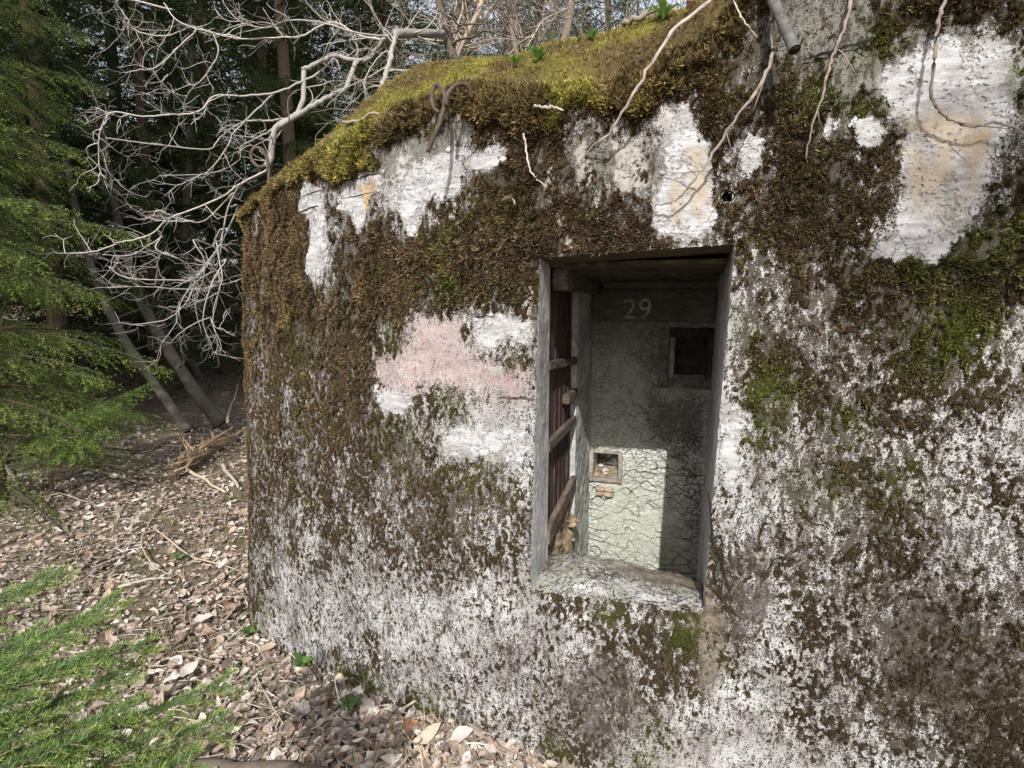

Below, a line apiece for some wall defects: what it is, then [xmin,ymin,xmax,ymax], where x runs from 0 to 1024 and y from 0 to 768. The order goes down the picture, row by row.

crack [588,462,731,593]